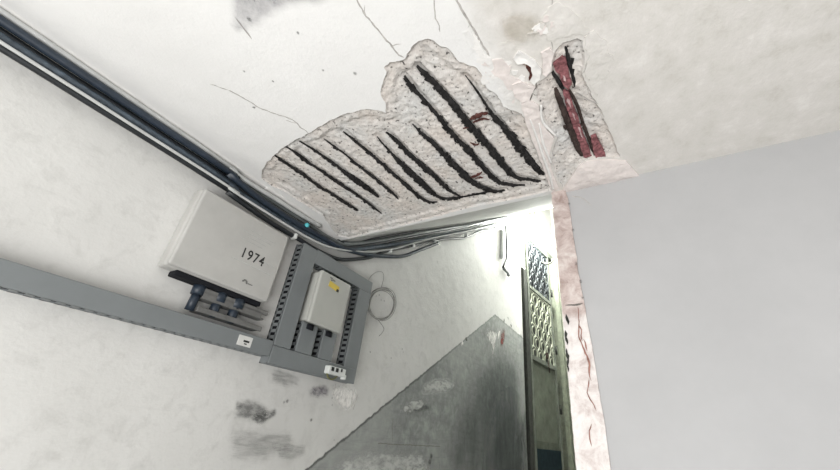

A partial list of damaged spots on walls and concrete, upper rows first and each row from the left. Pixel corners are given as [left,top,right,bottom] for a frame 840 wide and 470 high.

crack [357,0,404,58]
crack [211,84,309,134]
spalling [261,38,620,239]
rust [463,112,489,129]
crack [565,303,596,446]